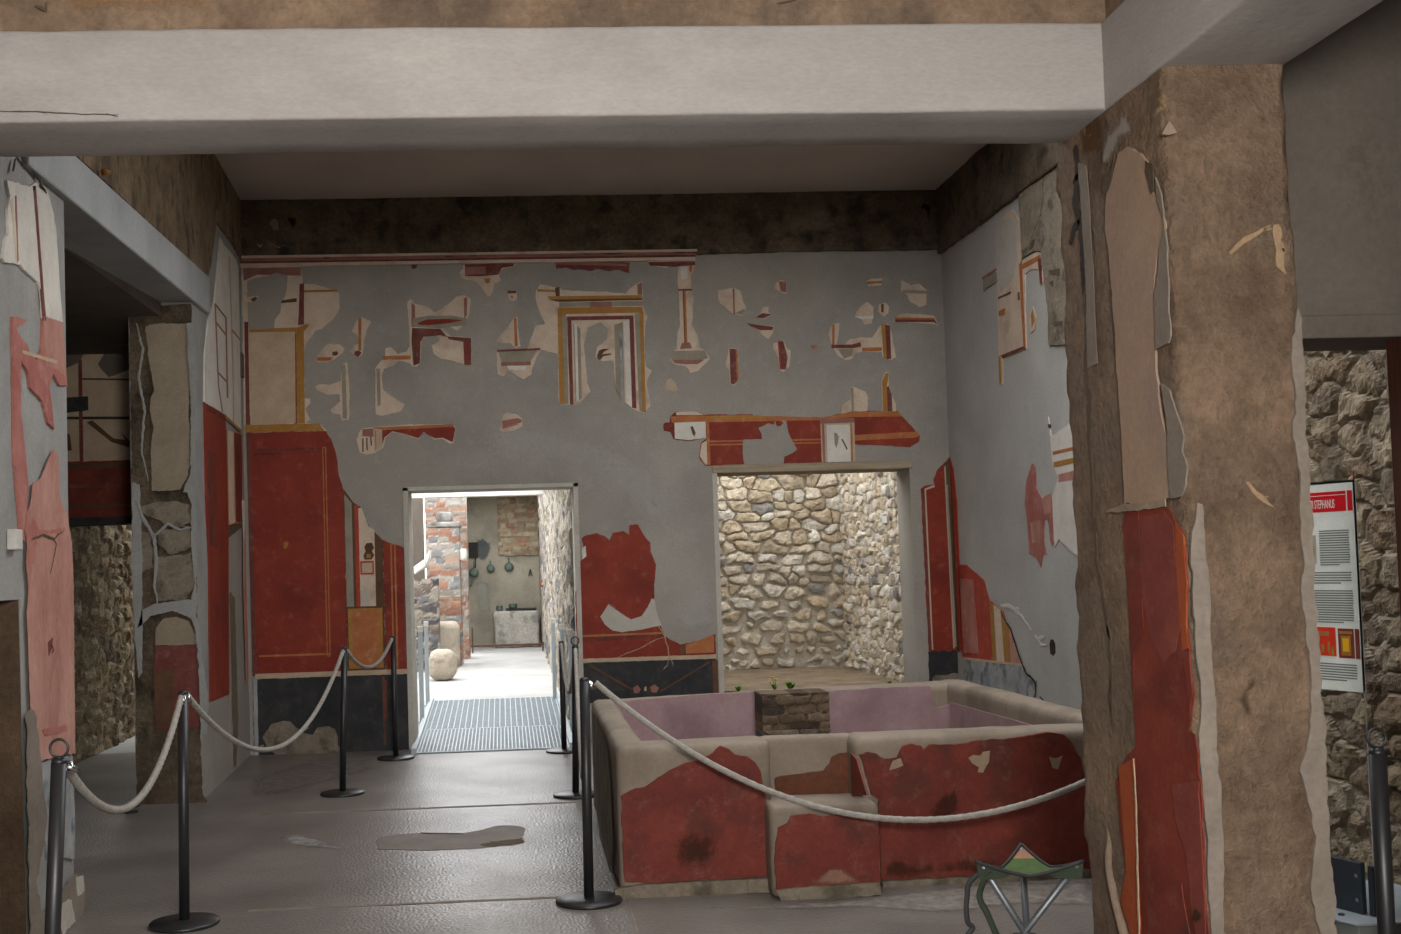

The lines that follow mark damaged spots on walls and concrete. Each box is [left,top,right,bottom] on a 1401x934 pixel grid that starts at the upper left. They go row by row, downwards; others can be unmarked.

spalling [1018,167,1067,346]
flaking render [743,420,797,465]
spalling [1106,498,1166,513]
flaking render [128,304,207,805]
flaking render [600,598,661,632]